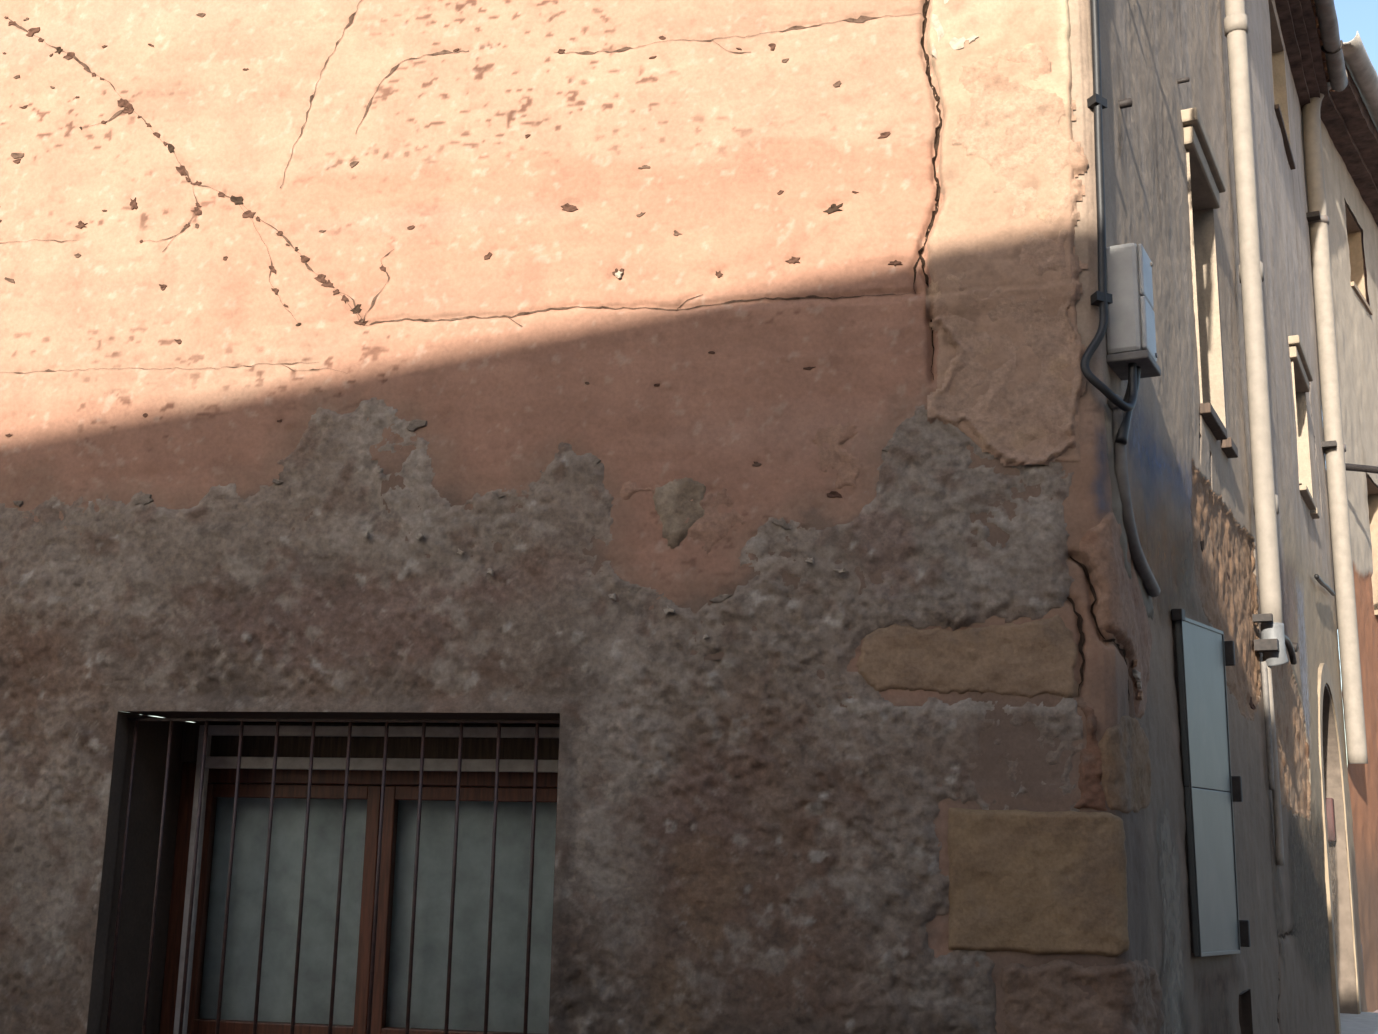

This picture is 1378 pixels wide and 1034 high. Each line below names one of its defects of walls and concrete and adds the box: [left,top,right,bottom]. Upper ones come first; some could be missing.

crack [4,0,942,380]
peeling [0,0,1088,1034]
spalling [1190,459,1312,820]